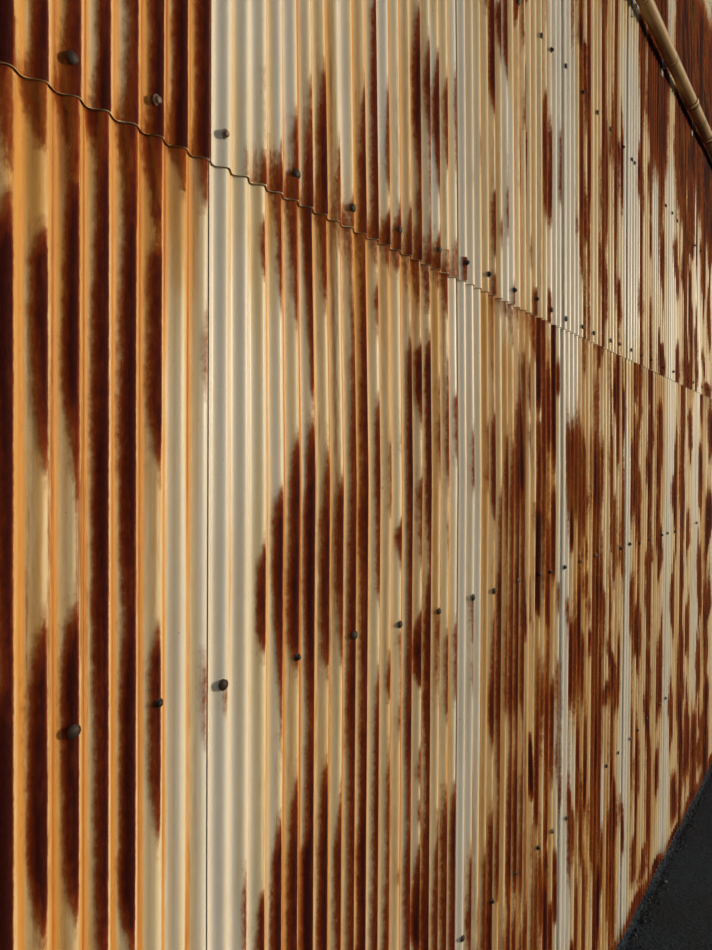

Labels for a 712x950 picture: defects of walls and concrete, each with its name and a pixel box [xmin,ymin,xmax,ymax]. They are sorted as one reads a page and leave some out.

corrosion [0,0,210,950]
corrosion [242,0,712,950]